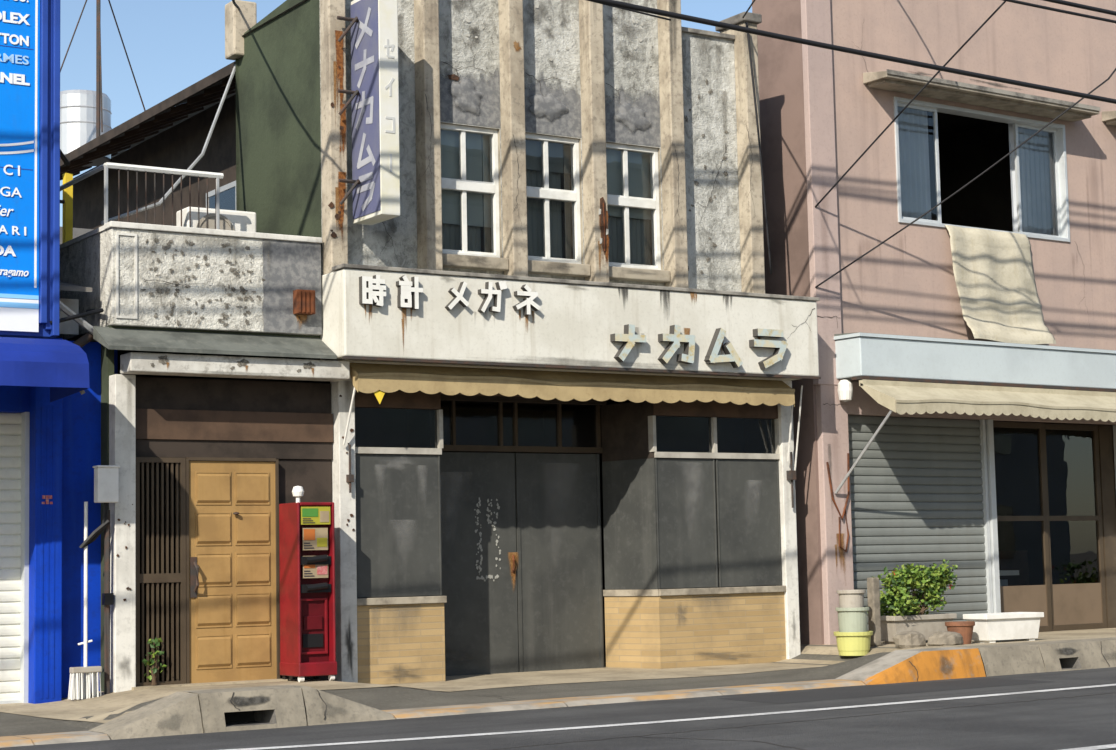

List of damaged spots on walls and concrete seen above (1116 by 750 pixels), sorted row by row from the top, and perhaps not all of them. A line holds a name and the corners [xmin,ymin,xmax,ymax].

rust [333,30,346,152]
rust [598,211,609,265]
peeling [141,202,343,334]
rust [402,307,412,347]
rust [508,552,518,585]
rust [835,533,845,567]